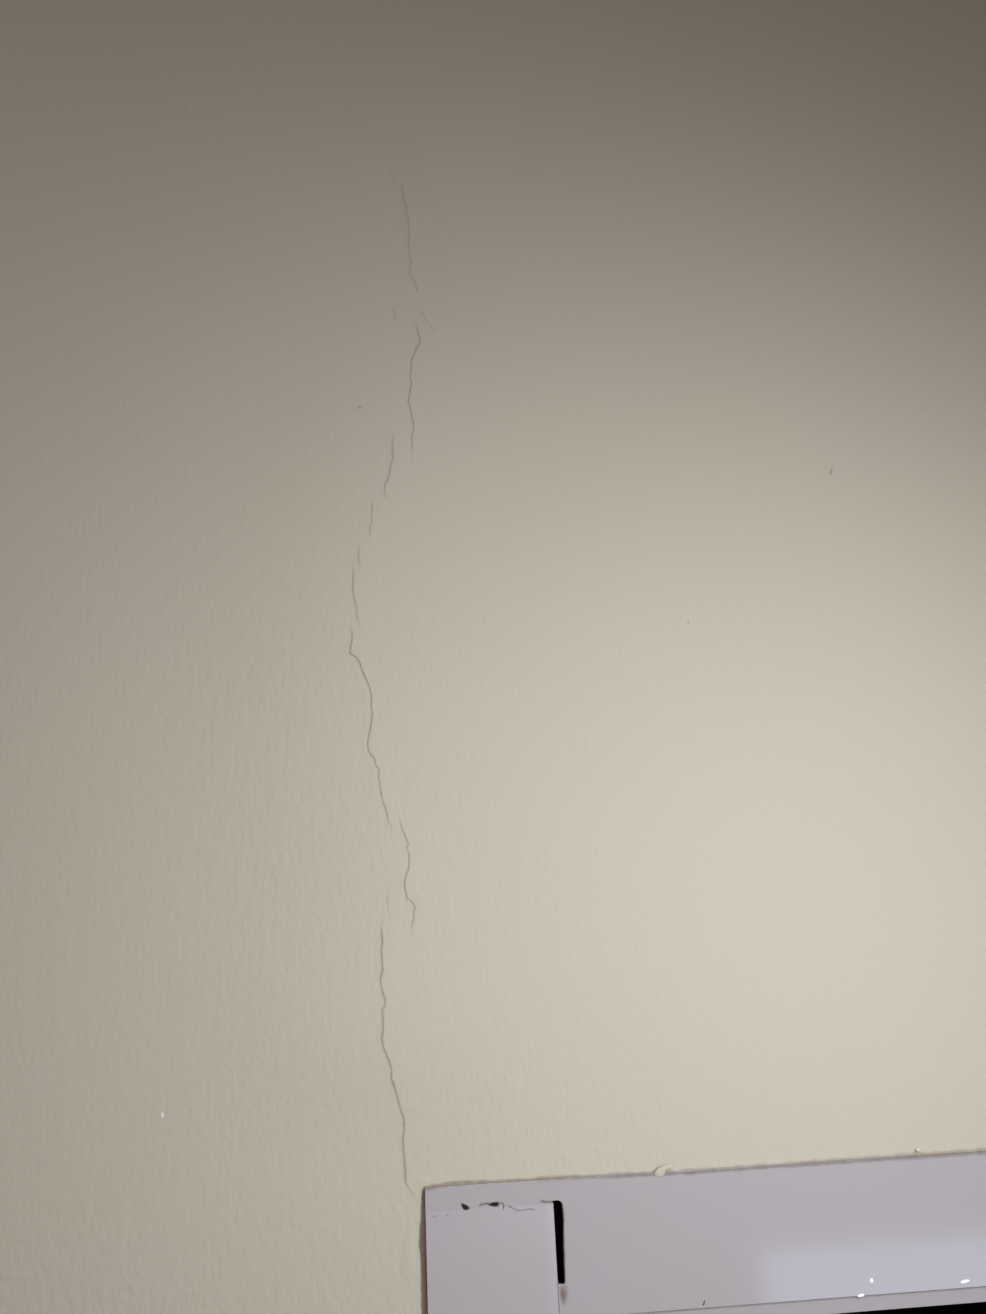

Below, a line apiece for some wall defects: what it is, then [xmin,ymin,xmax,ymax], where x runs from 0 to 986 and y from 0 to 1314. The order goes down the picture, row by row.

crack [343,181,439,1314]